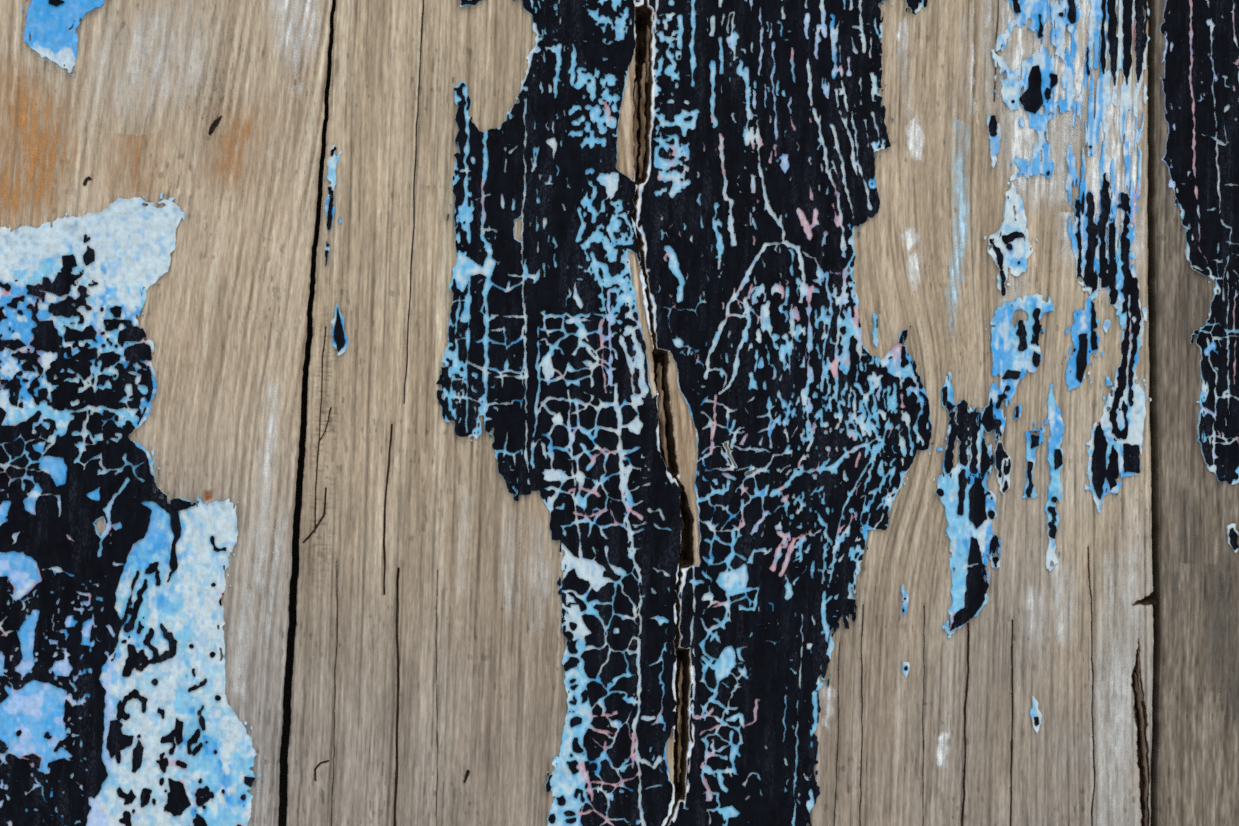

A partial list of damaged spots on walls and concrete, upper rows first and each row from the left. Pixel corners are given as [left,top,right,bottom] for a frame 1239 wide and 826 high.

peeling [22,0,106,76]
peeling [325,145,342,266]
peeling [331,303,349,356]
crack [616,0,700,826]
peeling [436,0,1239,826]
peeling [0,192,261,826]
crack [1131,638,1149,826]